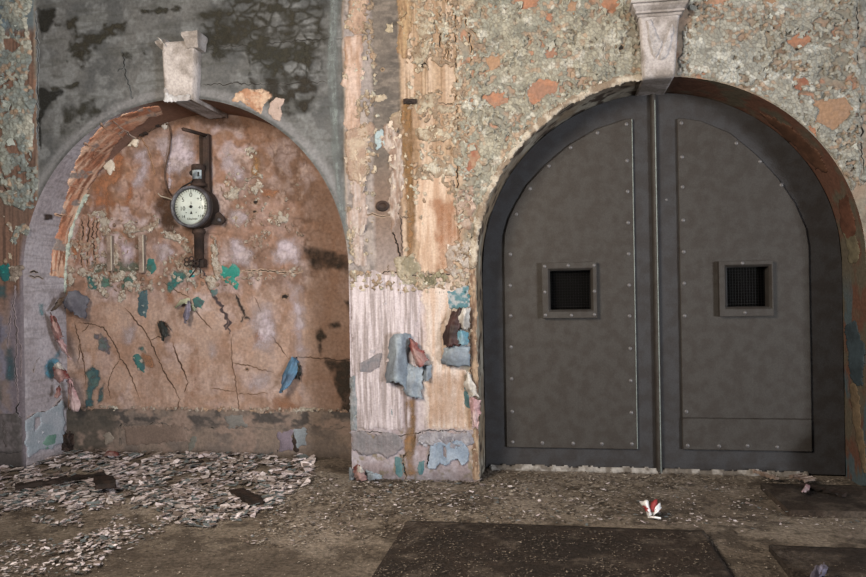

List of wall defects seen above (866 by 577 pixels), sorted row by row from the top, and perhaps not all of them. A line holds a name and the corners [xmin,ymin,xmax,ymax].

peeling [0,0,40,211]
crack [75,322,140,399]
flaking render [0,87,302,457]
leakage [200,0,347,230]
crack [118,271,475,479]
peeling [131,0,642,482]
crack [358,174,475,377]
crack [453,166,461,189]
crack [435,0,530,130]
peeling [677,0,866,190]
peeling [844,320,866,473]